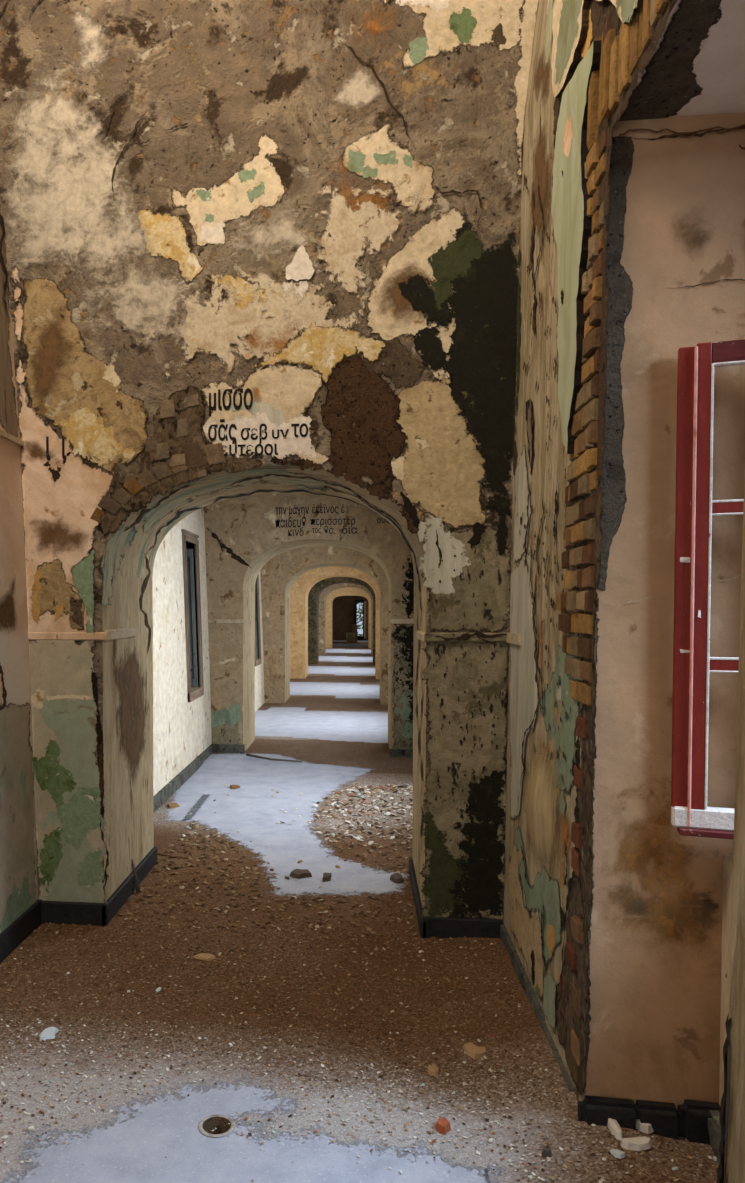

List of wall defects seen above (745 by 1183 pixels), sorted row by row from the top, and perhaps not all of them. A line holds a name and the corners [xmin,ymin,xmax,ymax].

flaking render [138,133,285,284]
flaking render [341,120,437,207]
damp [398,222,521,555]
flaking render [384,0,541,210]
crack [632,126,745,140]
crack [680,279,745,288]
flaking render [0,207,539,819]
damp [401,555,414,615]
flaking render [508,0,722,1096]
peeling [0,640,109,934]
damp [618,805,717,941]
flaking render [717,855,733,1183]